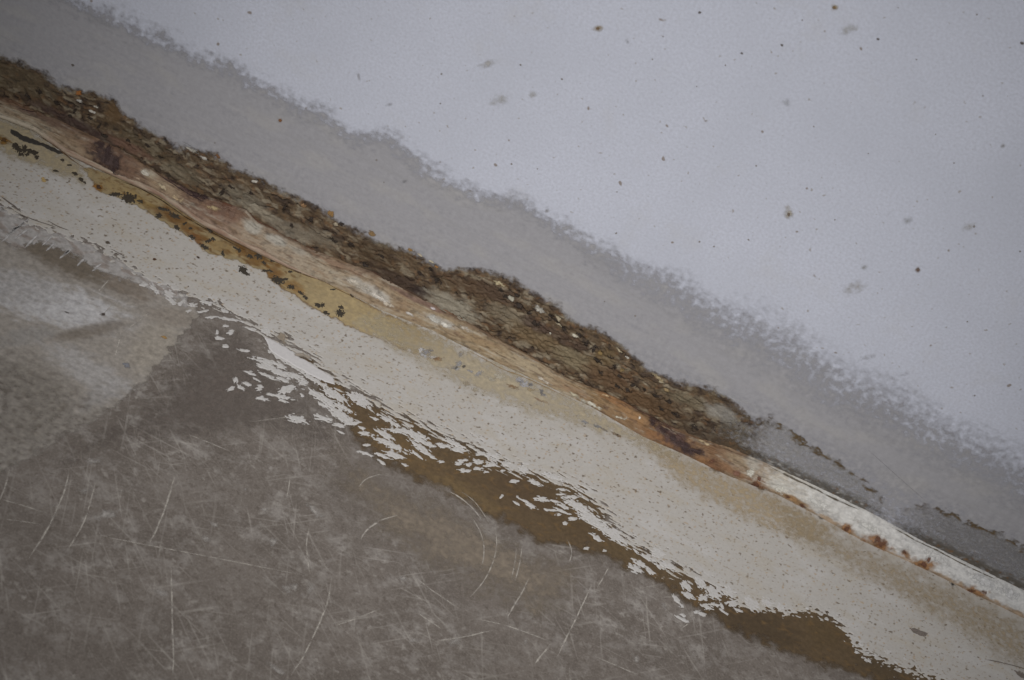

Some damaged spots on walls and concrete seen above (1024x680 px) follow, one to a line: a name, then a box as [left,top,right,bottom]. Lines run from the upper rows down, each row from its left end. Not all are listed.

damp [136,338,322,434]
peeling [139,278,787,623]
damp [300,356,944,680]
rust [864,535,887,550]
damp [909,520,1024,590]